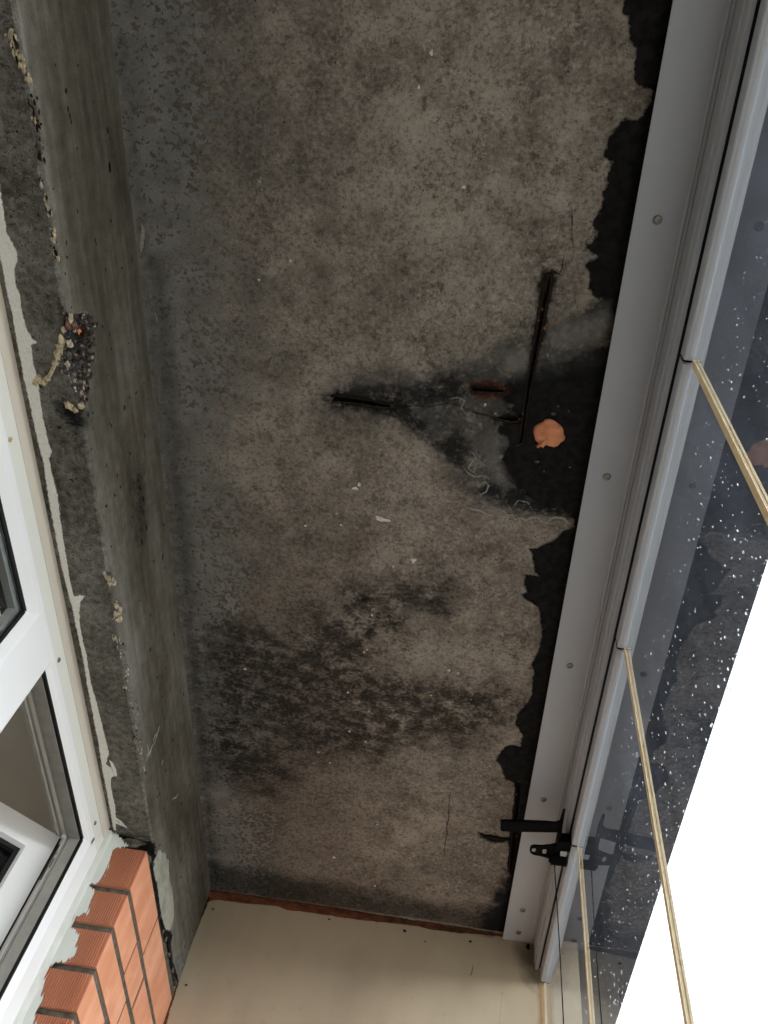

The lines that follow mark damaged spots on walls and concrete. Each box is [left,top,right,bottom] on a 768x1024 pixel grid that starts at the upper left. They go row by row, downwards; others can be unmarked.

water stain [195,0,673,932]